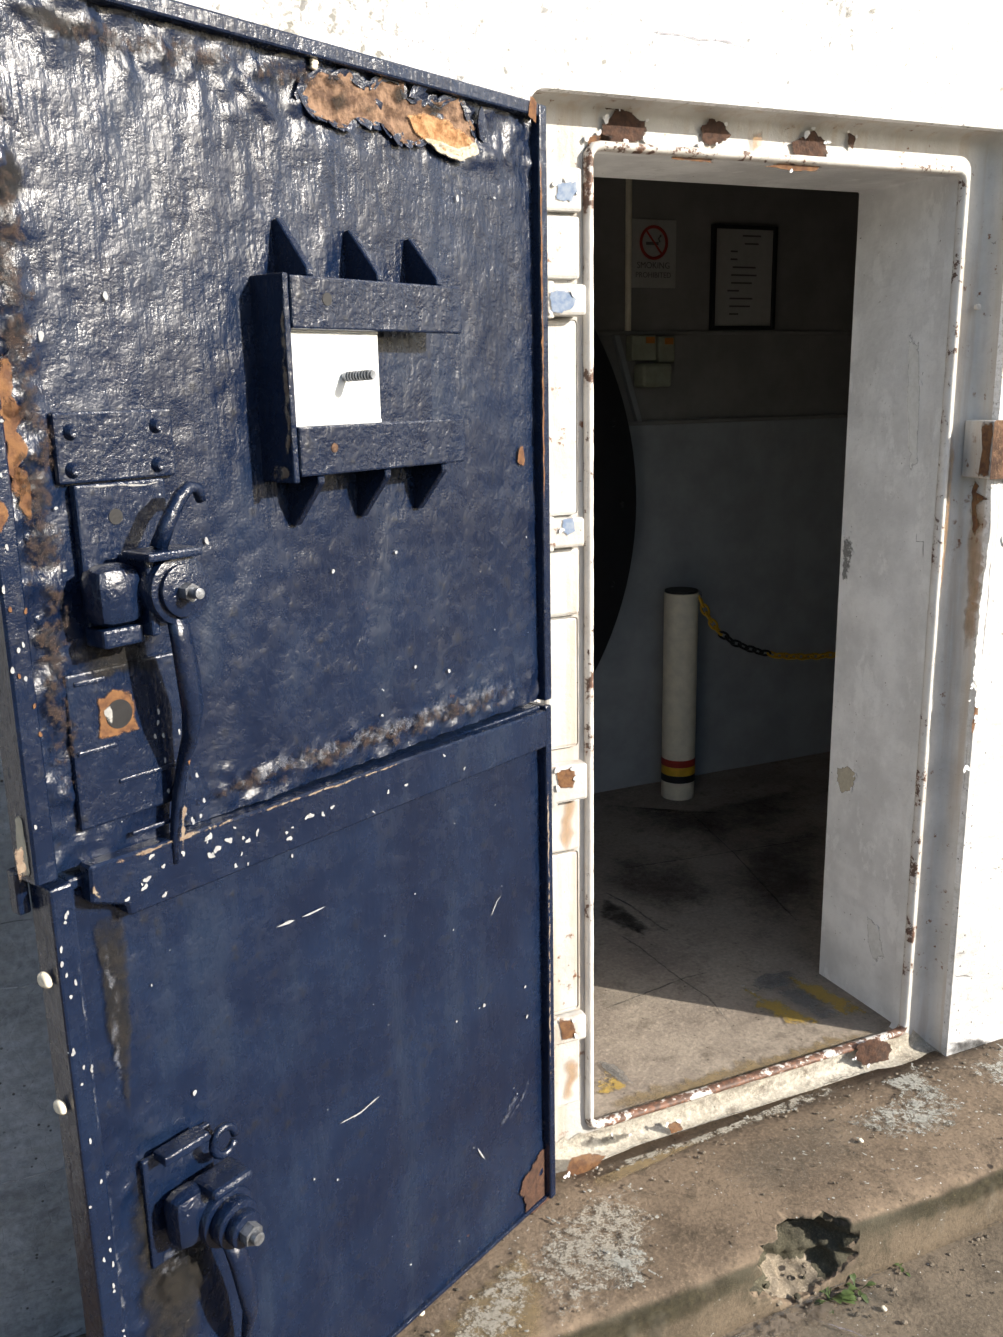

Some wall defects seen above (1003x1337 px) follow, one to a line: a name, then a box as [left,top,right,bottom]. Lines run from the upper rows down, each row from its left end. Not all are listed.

peeling [293,68,487,163]
corrosion [0,152,76,764]
corrosion [966,420,1003,627]
corrosion [98,689,139,739]
corrosion [852,1039,892,1068]
corrosion [520,1149,550,1214]
corrosion [563,1153,606,1179]
peeling [600,1133,632,1145]
peeling [616,1086,844,1170]
peeling [849,1044,1003,1169]
peeling [455,1183,663,1337]
spalling [749,1217,858,1306]